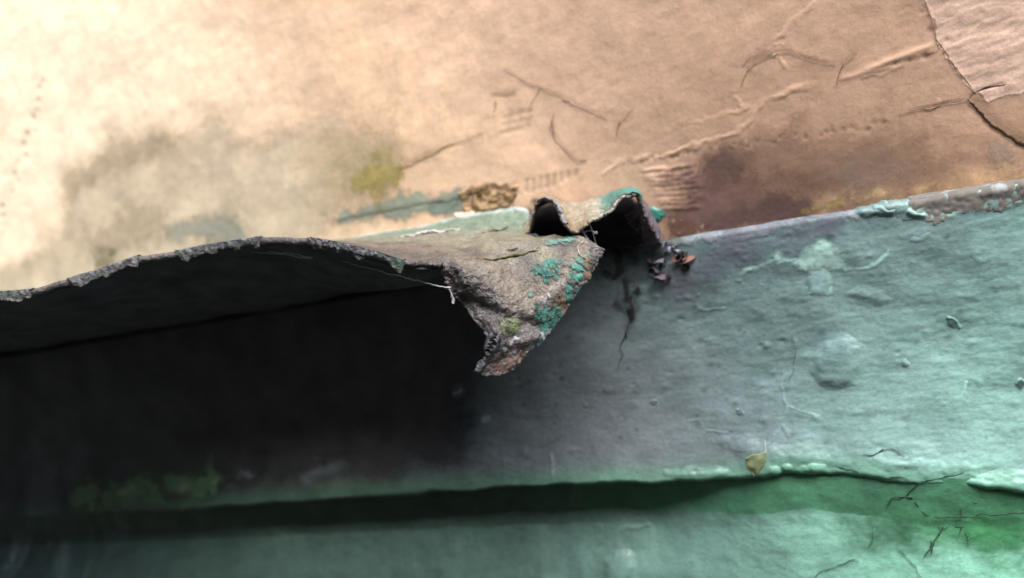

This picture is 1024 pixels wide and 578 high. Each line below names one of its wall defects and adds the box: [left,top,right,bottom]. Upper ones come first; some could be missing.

crack [900,0,1024,147]
water stain [0,111,403,291]
water stain [729,125,1024,235]
spalling [907,178,1024,225]
peeling [0,183,605,520]
crack [839,448,962,482]